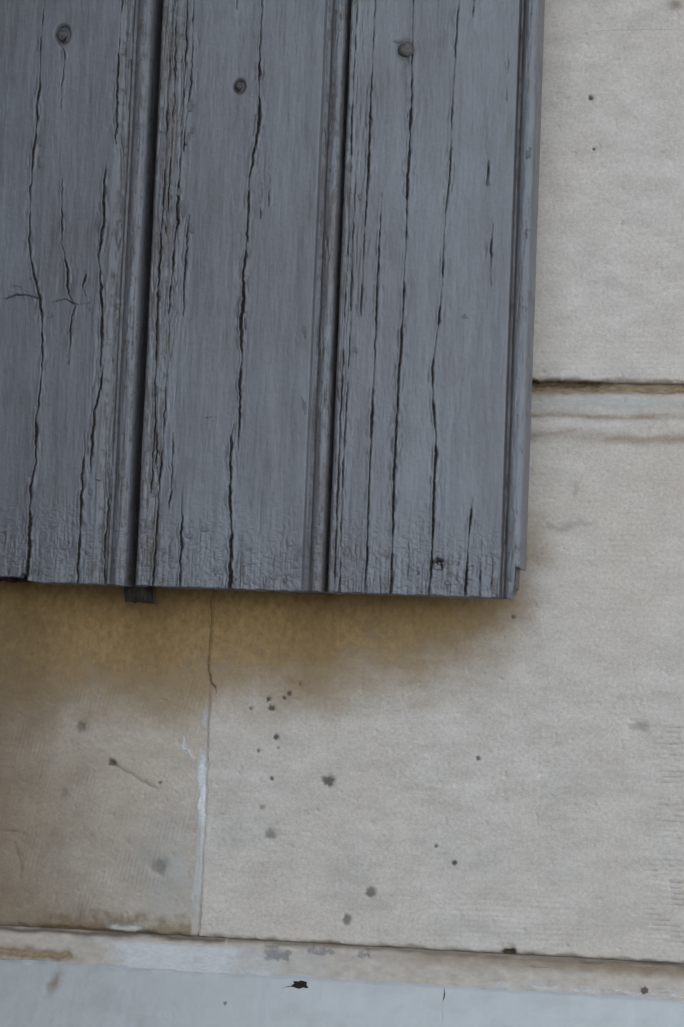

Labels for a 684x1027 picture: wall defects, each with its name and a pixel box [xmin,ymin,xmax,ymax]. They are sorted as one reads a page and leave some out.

crack [2,8,110,584]
crack [114,0,123,141]
crack [151,1,194,582]
crack [200,15,269,930]